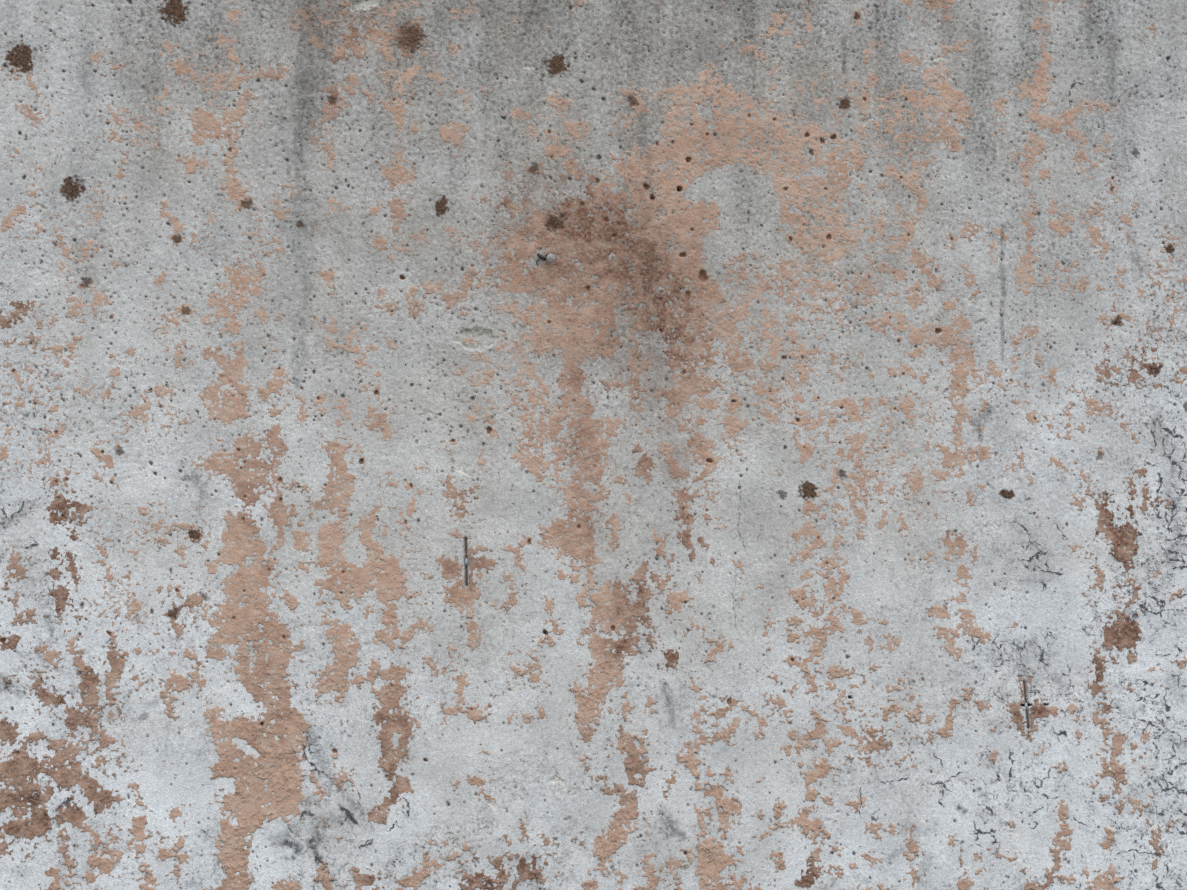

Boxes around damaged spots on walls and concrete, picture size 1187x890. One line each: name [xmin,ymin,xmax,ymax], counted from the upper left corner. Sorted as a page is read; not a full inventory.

corrosion [160,0,190,27]
corrosion [3,41,36,73]
corrosion [60,175,85,201]
corrosion [545,213,564,230]
corrosion [799,481,817,499]
crack [1136,418,1187,618]
crack [1012,522,1068,592]
crack [972,631,1072,689]
peeling [442,743,523,810]
crack [859,727,1086,846]
crack [1116,646,1187,890]
peeling [268,871,302,890]